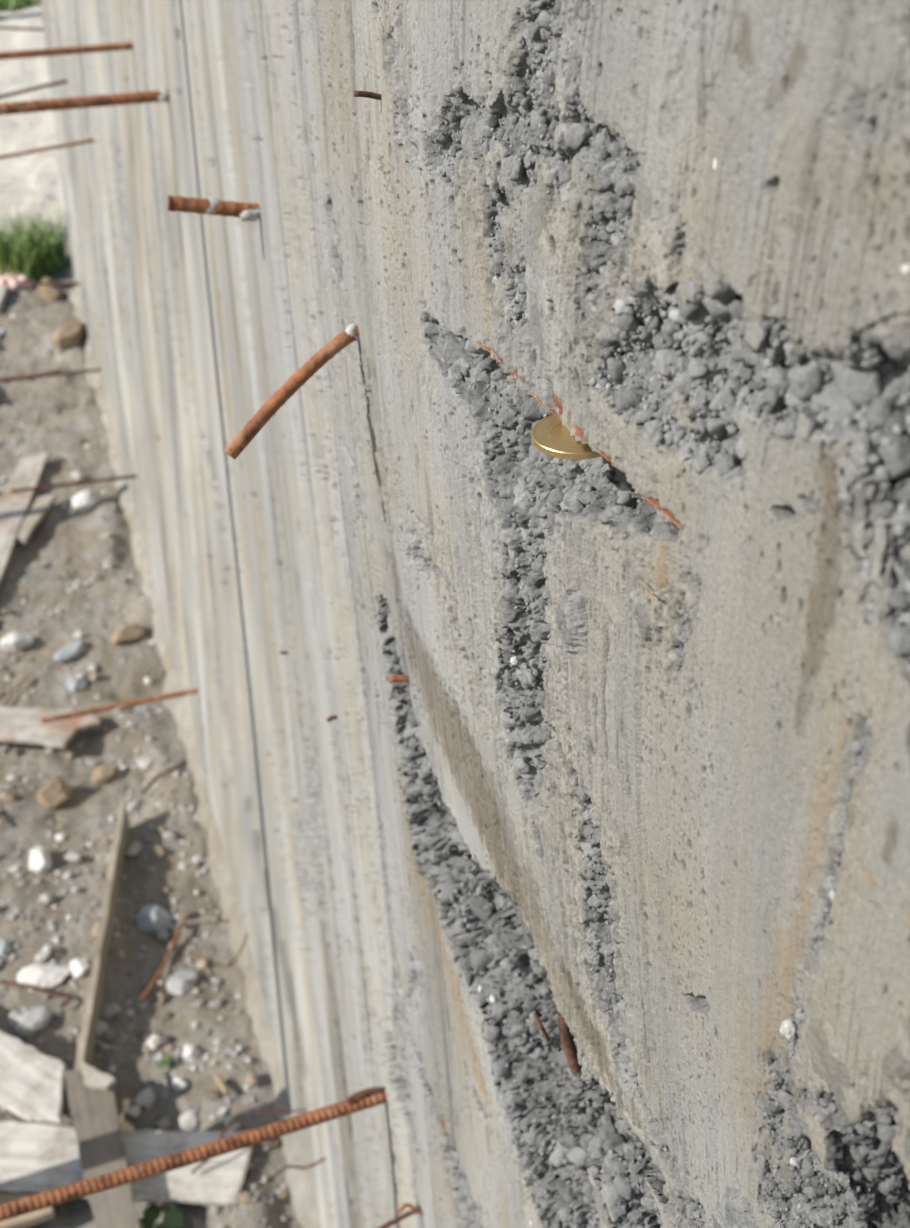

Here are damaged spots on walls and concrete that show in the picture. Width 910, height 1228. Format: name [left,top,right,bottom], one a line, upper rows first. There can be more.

spalling [422,0,910,694]
spalling [394,509,474,675]
spalling [496,538,561,799]
spalling [812,719,873,974]
spalling [409,763,705,1228]
peeling [762,979,910,1228]